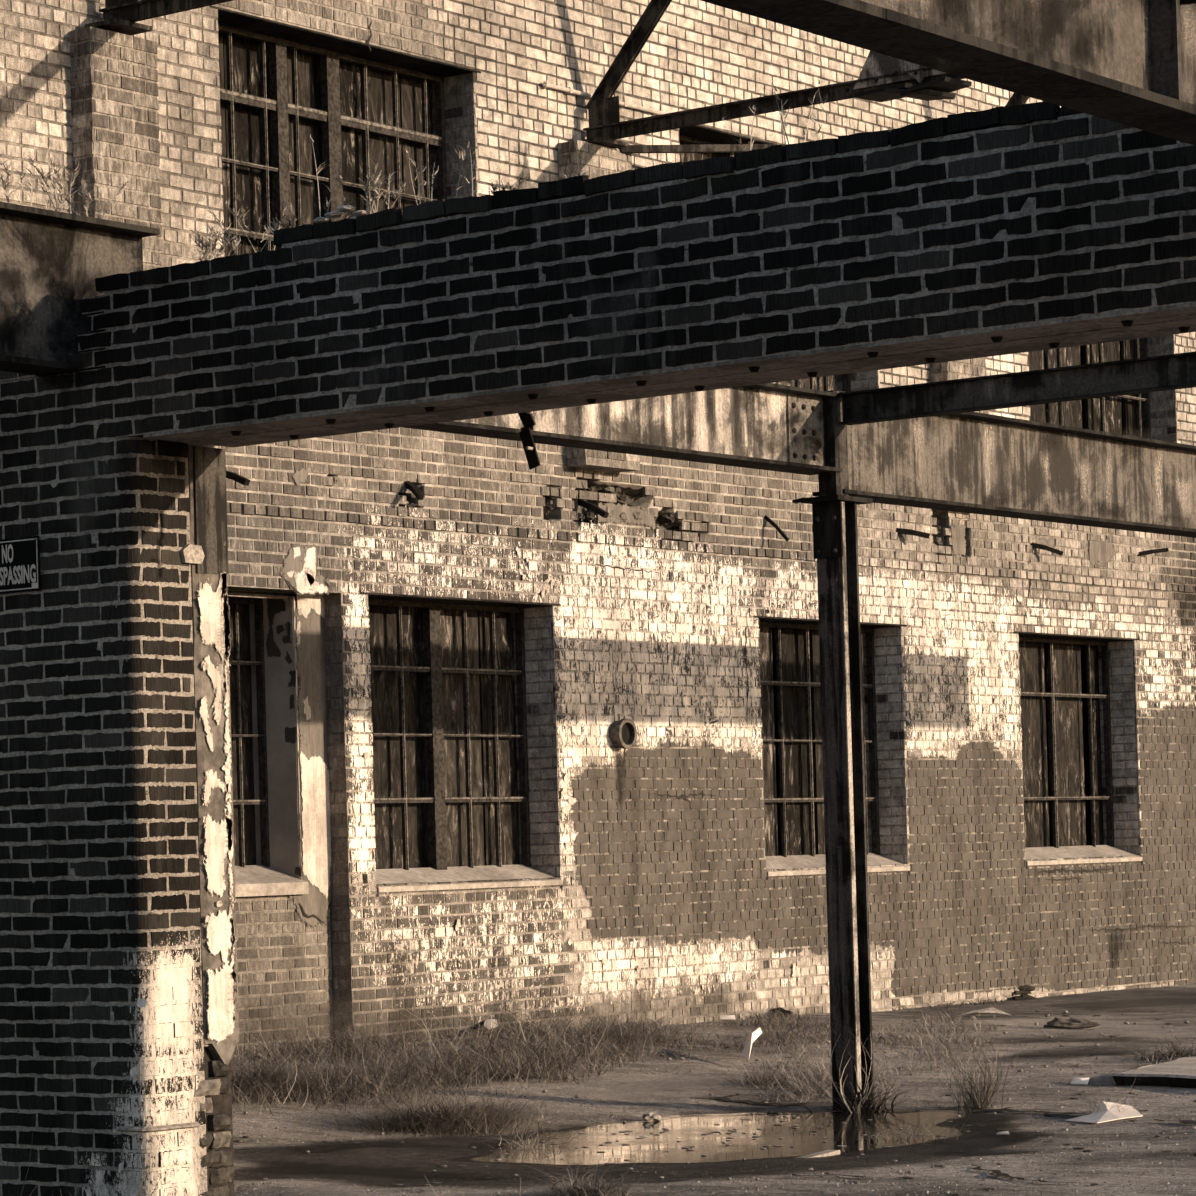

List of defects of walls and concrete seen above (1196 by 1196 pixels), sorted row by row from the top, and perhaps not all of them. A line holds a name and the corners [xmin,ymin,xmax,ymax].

rust [985,429,1006,506]
peeling [78,572,238,1196]
peeling [266,481,829,1034]
peeling [870,939,900,998]
peeling [858,510,1196,775]